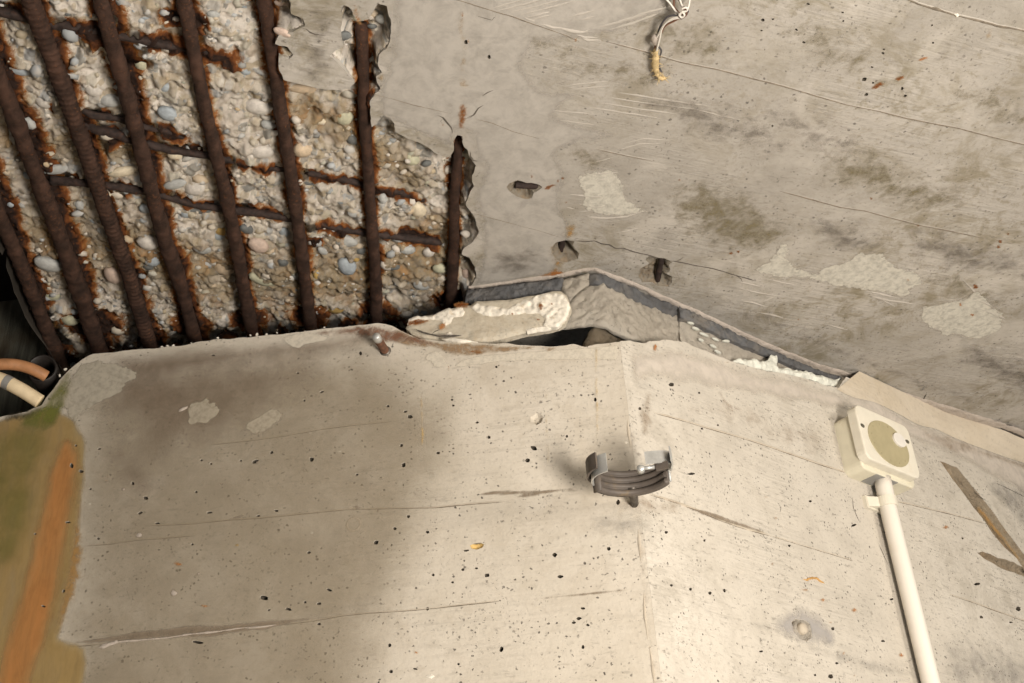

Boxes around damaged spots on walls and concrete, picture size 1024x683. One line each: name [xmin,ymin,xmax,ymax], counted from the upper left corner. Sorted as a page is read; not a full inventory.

rust [5,2,25,23]
rust [0,20,142,364]
spalling [0,0,188,374]
spalling [113,0,247,340]
rust [41,0,468,347]
spalling [197,0,530,355]
spalling [507,180,542,199]
spalling [552,240,579,262]
spalling [638,256,672,286]